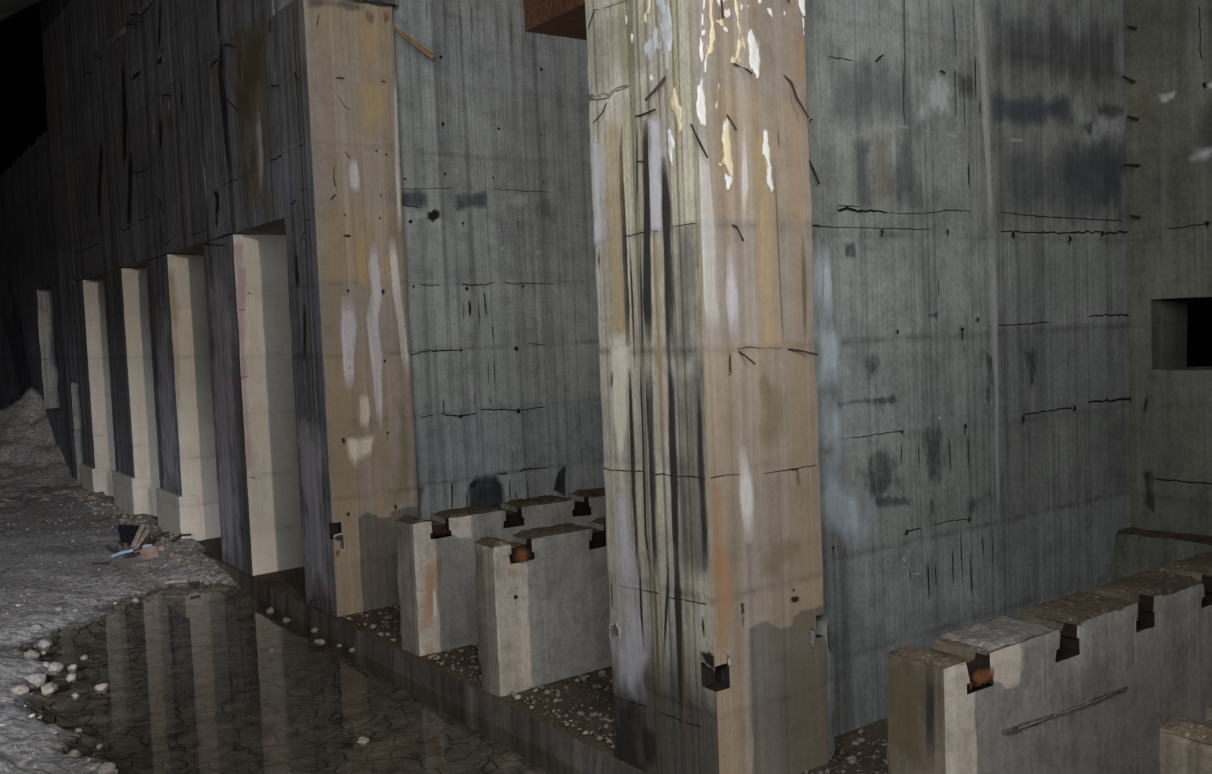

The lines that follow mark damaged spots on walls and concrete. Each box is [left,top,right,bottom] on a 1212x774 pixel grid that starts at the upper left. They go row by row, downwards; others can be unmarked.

peeling [625,0,672,68]
peeling [667,0,805,167]
damp [903,6,1068,207]
peeling [719,118,733,190]
peeling [762,130,774,192]
crack [812,205,969,230]
crack [1001,212,1128,235]
damp [985,270,999,497]
damp [554,466,565,496]
damp [594,120,686,772]
damp [698,399,707,566]
rust [967,669,994,690]